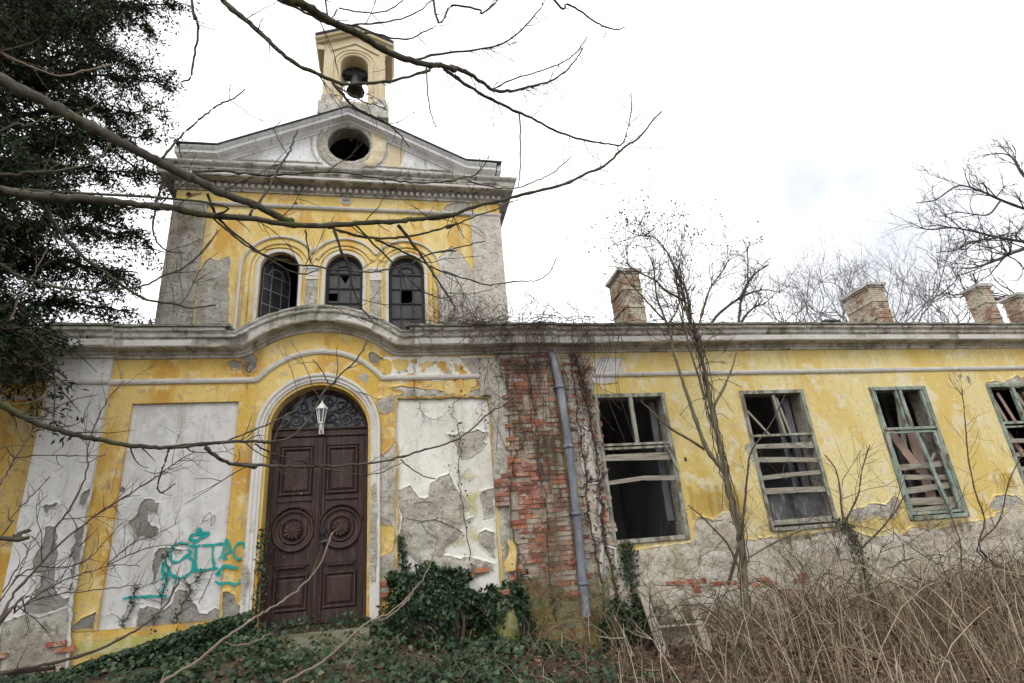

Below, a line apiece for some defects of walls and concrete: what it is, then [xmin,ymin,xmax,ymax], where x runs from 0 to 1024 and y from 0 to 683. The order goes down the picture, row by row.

peeling [441,202,474,212]
peeling [193,255,248,328]
peeling [430,245,477,324]
peeling [77,485,93,509]
peeling [358,350,1024,650]
peeling [127,497,186,585]
flaking render [0,500,99,682]
peeling [134,551,249,627]